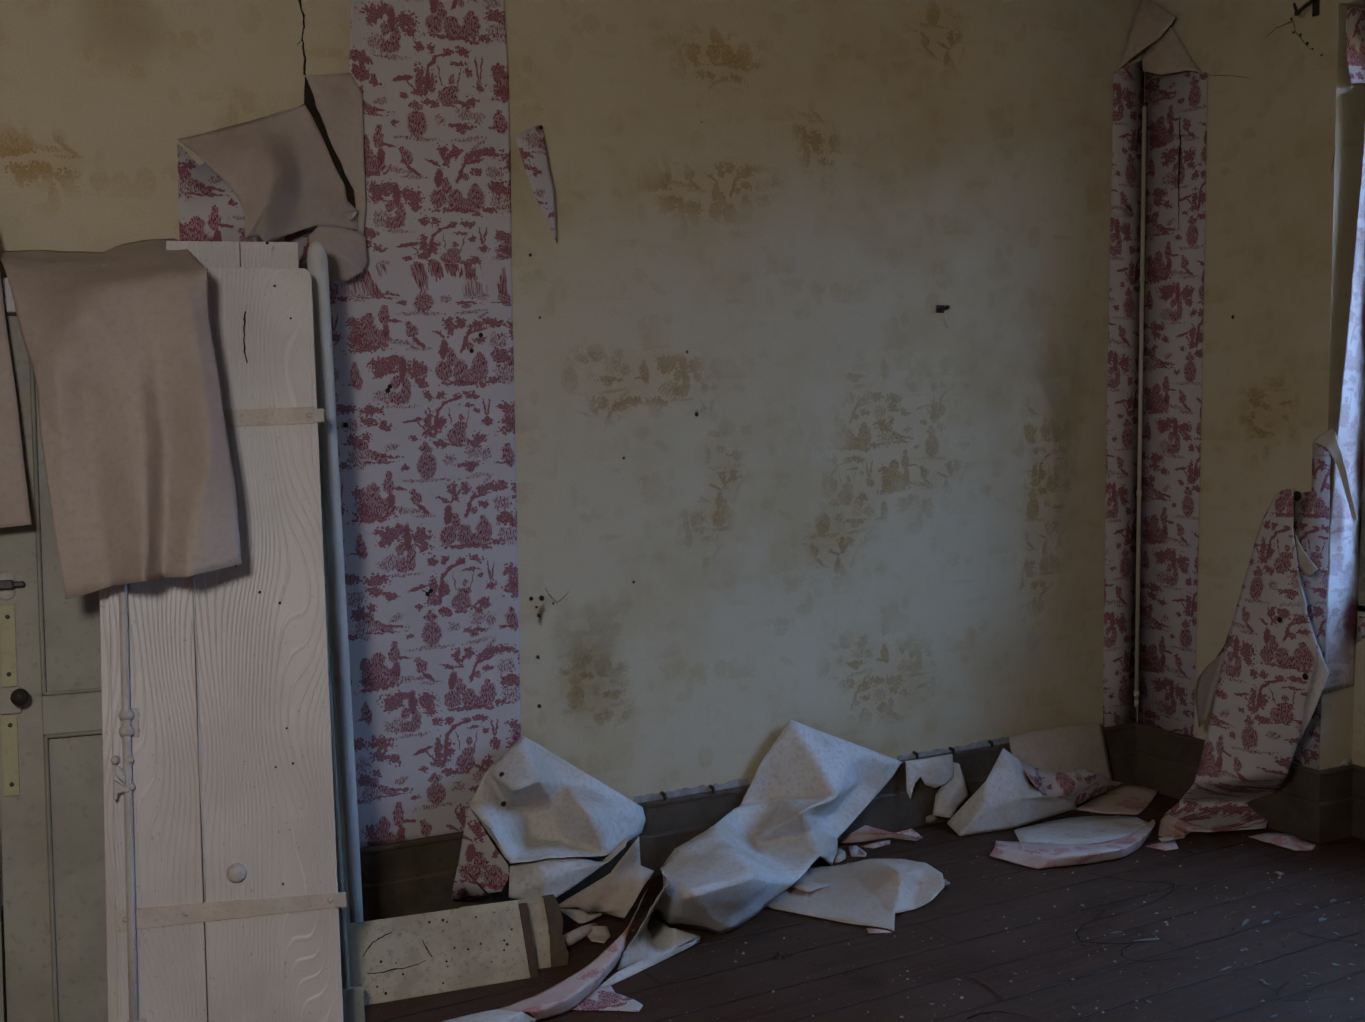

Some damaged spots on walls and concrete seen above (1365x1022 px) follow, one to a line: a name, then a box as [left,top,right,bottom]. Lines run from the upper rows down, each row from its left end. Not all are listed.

crack [297,0,356,208]